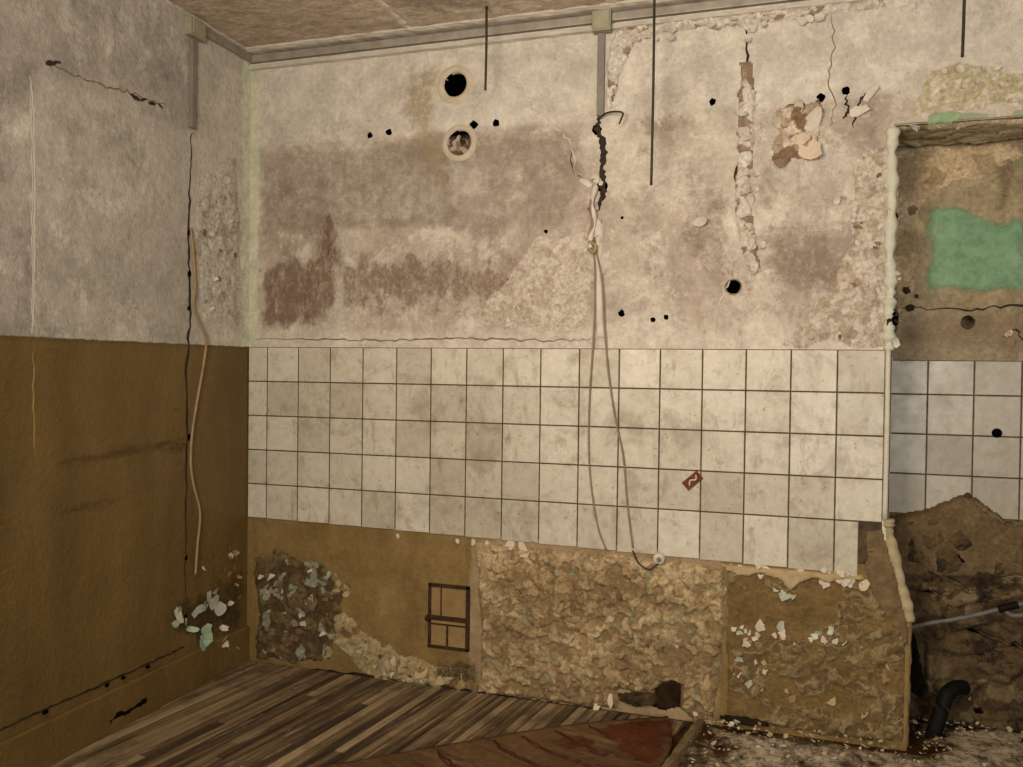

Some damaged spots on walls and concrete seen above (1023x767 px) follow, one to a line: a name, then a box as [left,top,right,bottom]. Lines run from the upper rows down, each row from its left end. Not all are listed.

crack [29,60,166,467]
crack [184,134,192,621]
damp [264,214,509,325]
flaking render [772,97,824,168]
flaking render [882,62,1023,351]
crack [896,304,1023,346]
crack [0,646,185,731]
flaking render [311,492,1023,751]